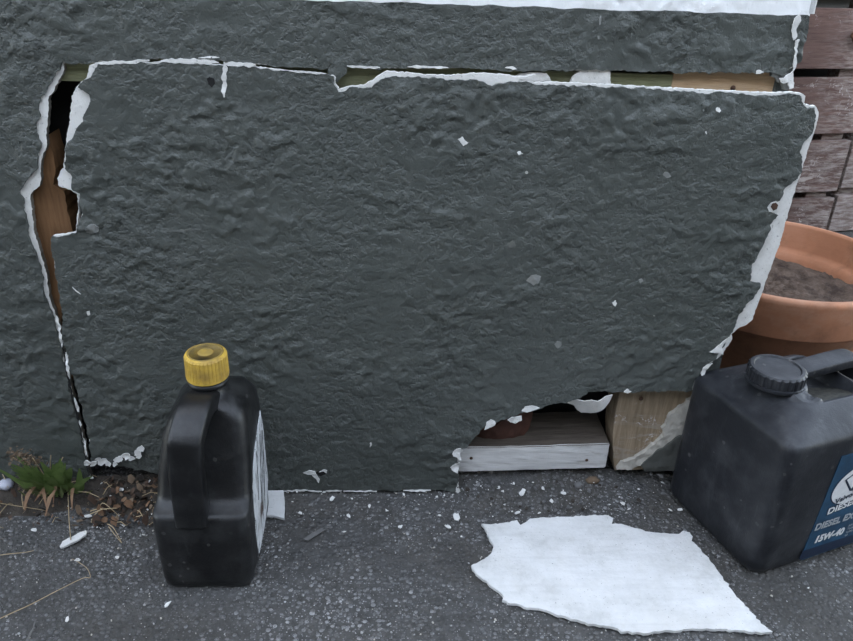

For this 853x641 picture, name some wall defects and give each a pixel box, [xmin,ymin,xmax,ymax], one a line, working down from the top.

crack [96,56,256,97]
crack [290,68,327,76]
crack [348,63,380,71]
crack [408,63,448,71]
crack [505,66,611,84]
crack [56,316,88,460]
spalling [508,405,539,424]
spalling [450,448,463,493]